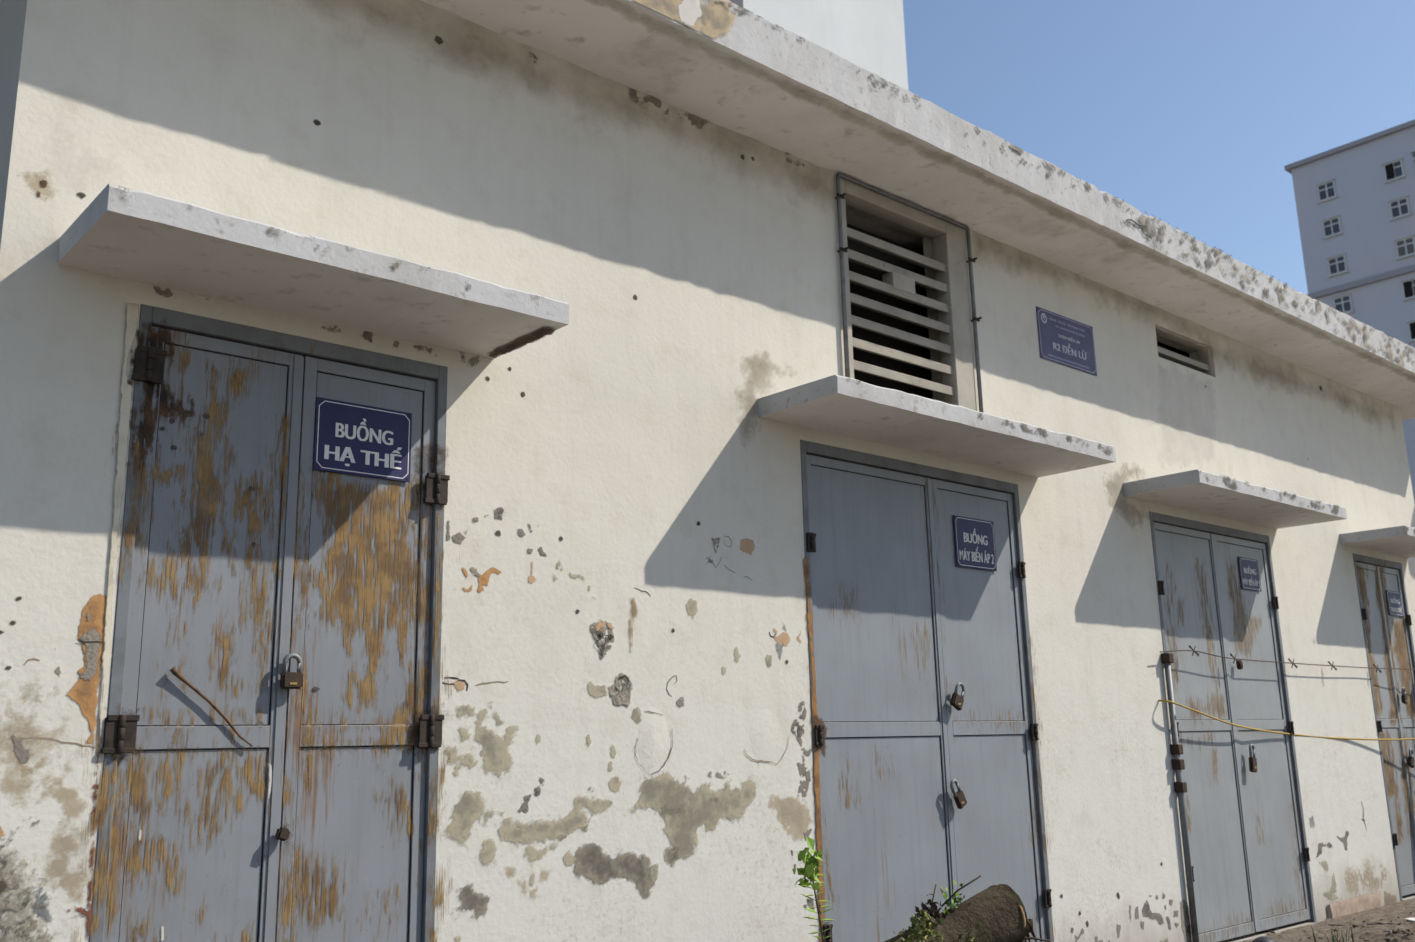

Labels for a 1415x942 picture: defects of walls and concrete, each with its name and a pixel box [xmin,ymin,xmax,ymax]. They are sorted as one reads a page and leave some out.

peeling [634,0,736,38]
peeling [67,594,107,743]
rust [67,322,452,942]
peeling [518,778,544,813]
peeling [791,701,811,797]
rust [1165,561,1225,721]
rust [1227,563,1262,656]
rust [1356,558,1415,842]
spalling [0,827,53,942]